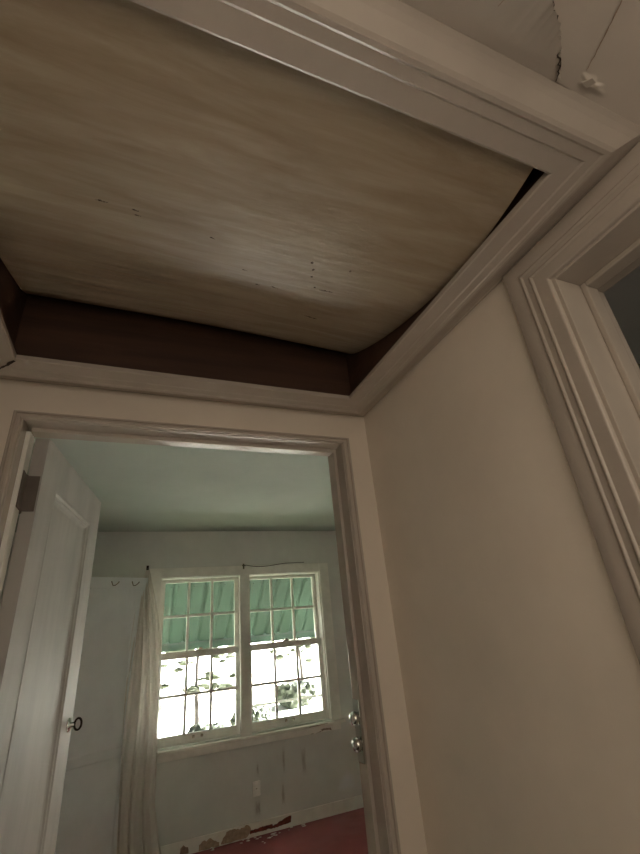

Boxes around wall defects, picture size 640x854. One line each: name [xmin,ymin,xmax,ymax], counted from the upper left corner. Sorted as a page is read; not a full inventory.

crack [553,1,561,82]
peeling [180,825,251,854]